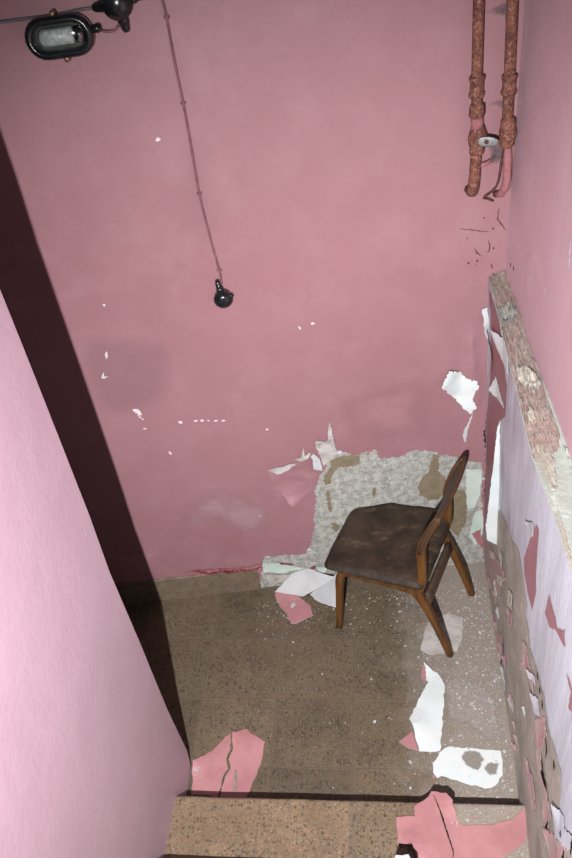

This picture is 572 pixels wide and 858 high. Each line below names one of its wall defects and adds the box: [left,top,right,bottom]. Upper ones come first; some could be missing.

peeling [190,267,572,858]